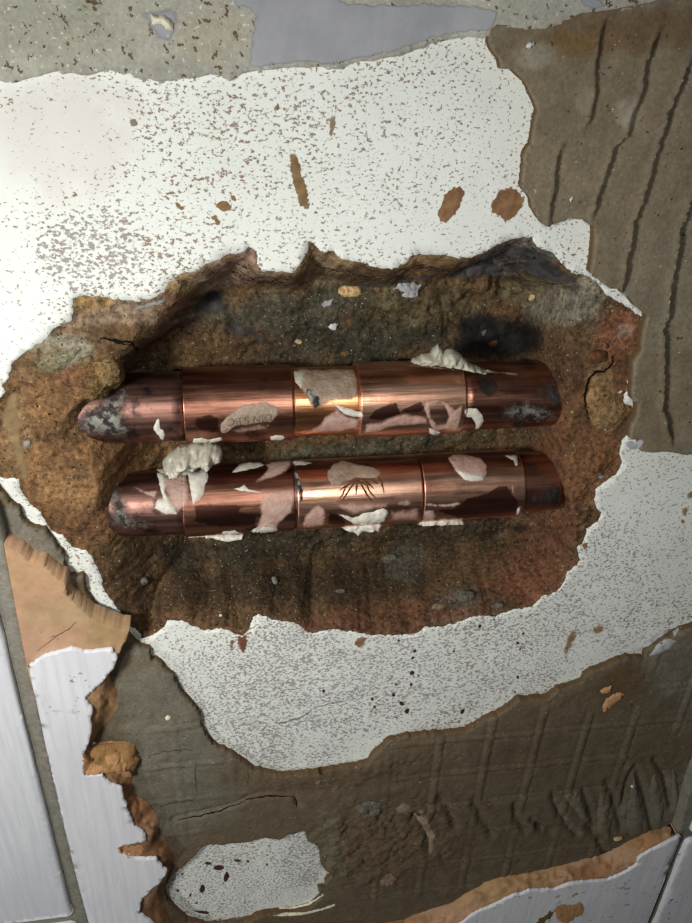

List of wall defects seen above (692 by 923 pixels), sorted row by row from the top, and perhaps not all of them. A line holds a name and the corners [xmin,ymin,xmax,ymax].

peeling [491,187,524,222]
crack [584,342,613,420]
spalling [0,237,644,647]
peeling [640,627,679,656]
crack [277,698,356,724]
peeling [600,685,624,712]
crack [85,672,297,923]
peeling [118,844,144,858]
crack [387,826,671,923]
peeling [273,894,335,916]
peeling [536,893,584,923]